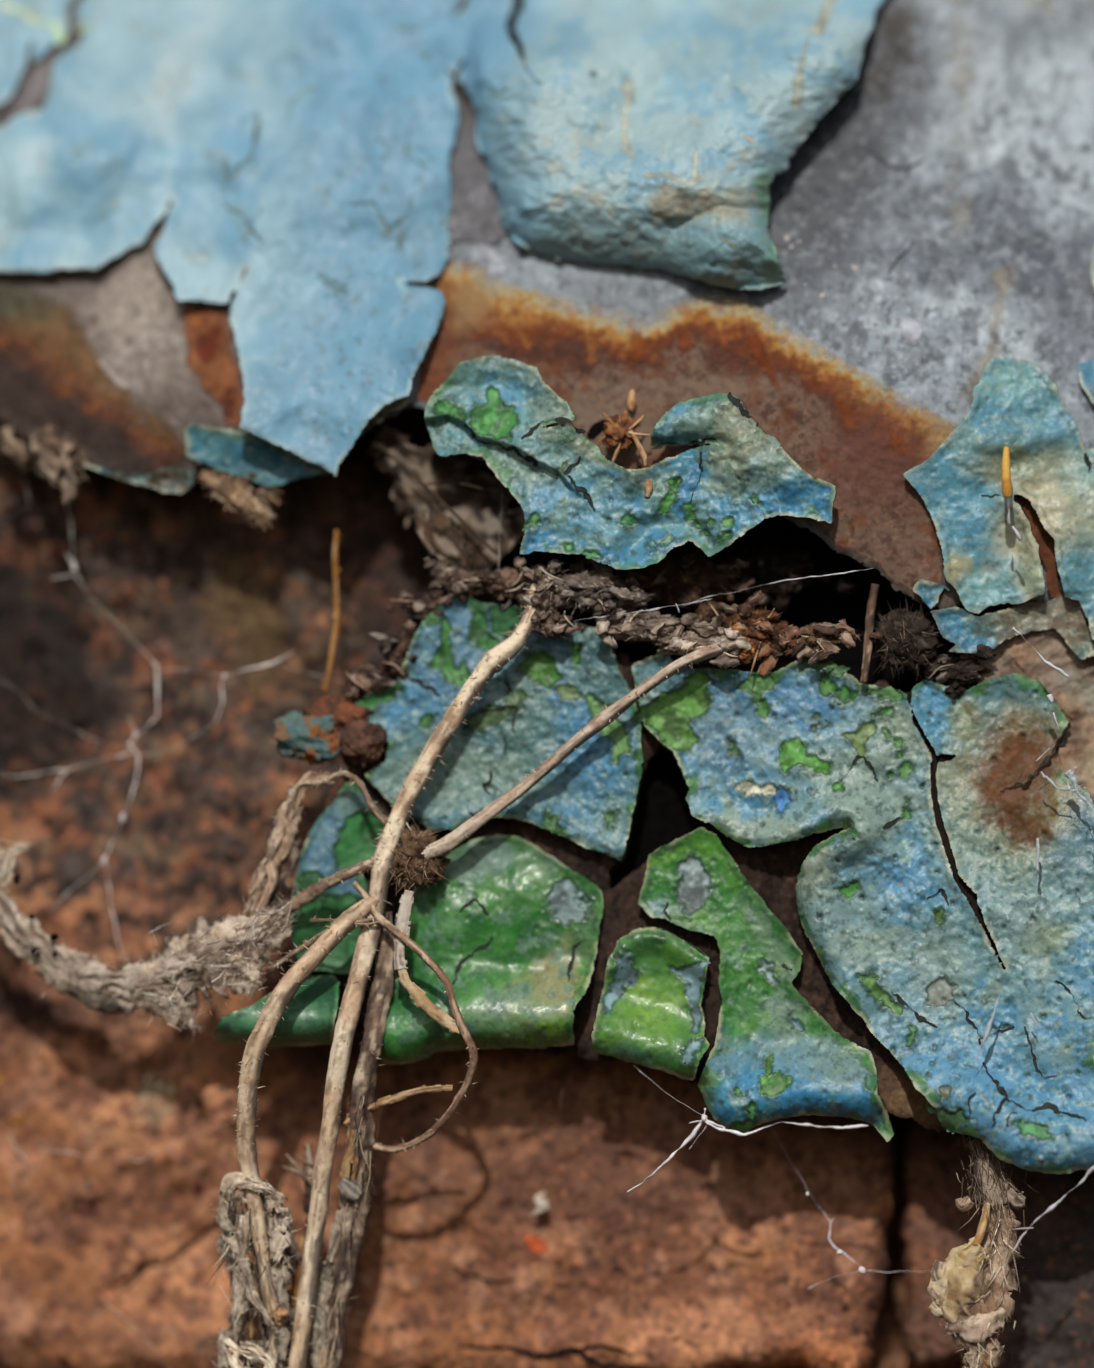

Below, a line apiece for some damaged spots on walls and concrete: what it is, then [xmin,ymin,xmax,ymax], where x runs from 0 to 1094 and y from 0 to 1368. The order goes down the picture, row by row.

crack [0,0,94,126]
crack [378,0,542,245]
crack [340,198,438,289]
peeling [0,0,884,495]
rust [0,286,184,474]
rust [184,305,243,426]
rust [416,264,954,598]
peeling [290,595,522,959]
peeling [380,356,1094,1175]
rust [981,723,1071,840]
peeling [212,993,271,1047]
peeling [268,926,361,1048]